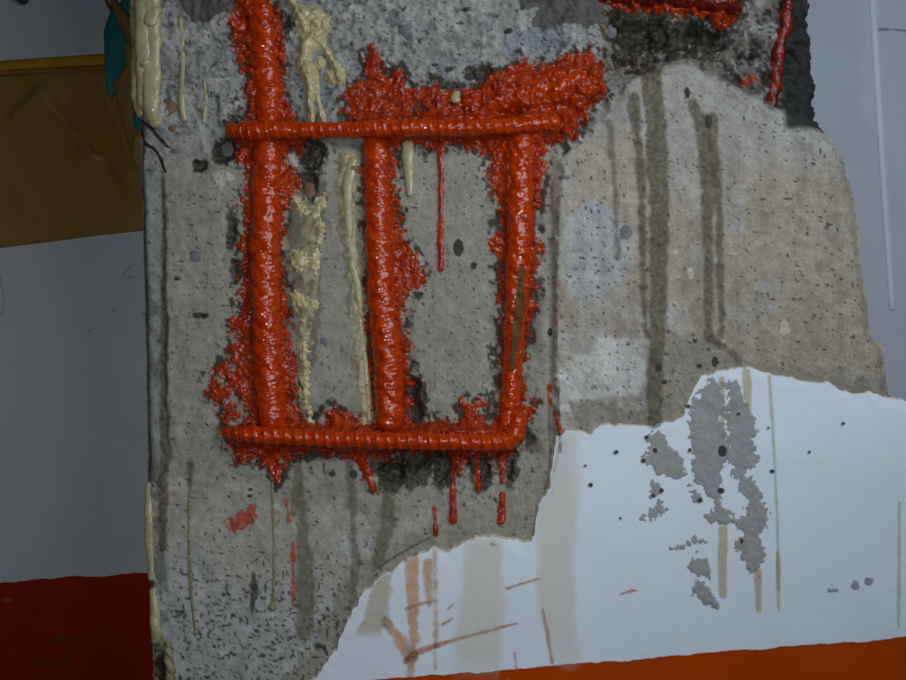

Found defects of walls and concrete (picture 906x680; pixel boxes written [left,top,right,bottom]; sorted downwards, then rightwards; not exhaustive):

spalling [140,0,898,549]
water stain [628,67,751,427]
water stain [292,465,314,640]
water stain [346,458,361,605]
water stain [359,487,394,631]
corrosion [383,550,517,673]
water stain [719,526,727,597]